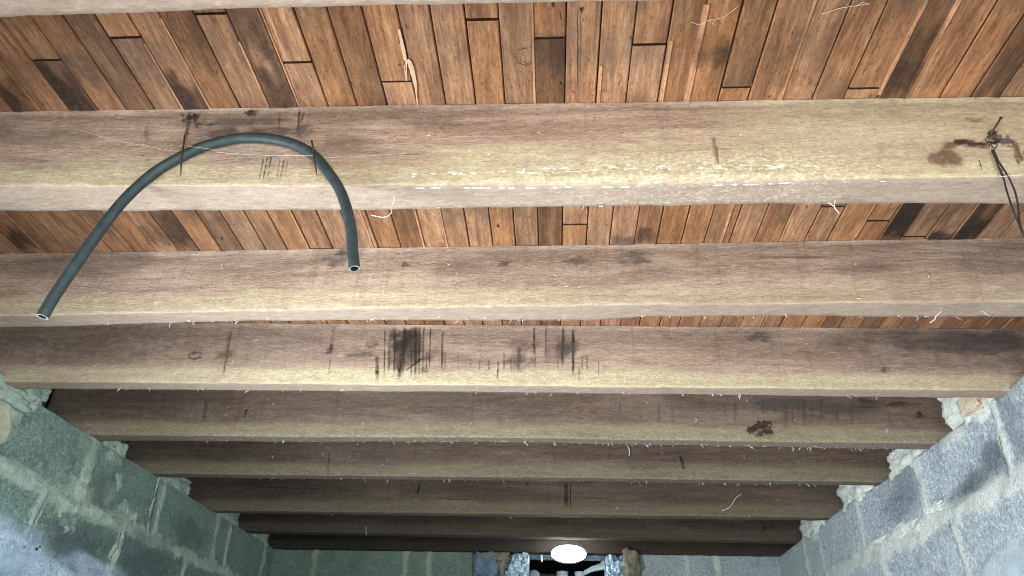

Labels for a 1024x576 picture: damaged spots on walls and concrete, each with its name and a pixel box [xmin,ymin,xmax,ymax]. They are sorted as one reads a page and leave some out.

leakage [348,329,443,376]
leakage [747,399,871,437]